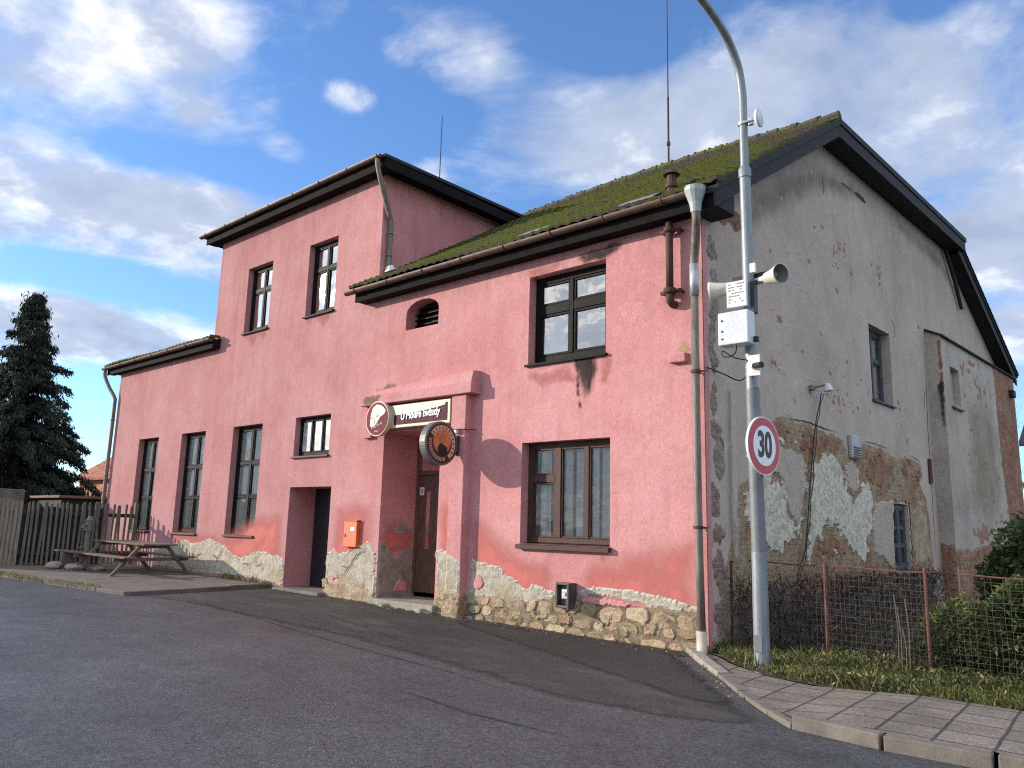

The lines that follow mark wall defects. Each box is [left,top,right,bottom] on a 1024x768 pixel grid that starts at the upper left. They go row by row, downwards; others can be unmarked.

spalling [706,234,718,283]
water stain [544,353,607,406]
flaking render [708,299,753,656]
flaking render [763,359,1024,647]
flaking render [153,538,284,586]
flaking render [326,524,414,598]
flaking render [435,549,555,603]
flaking render [578,587,697,612]